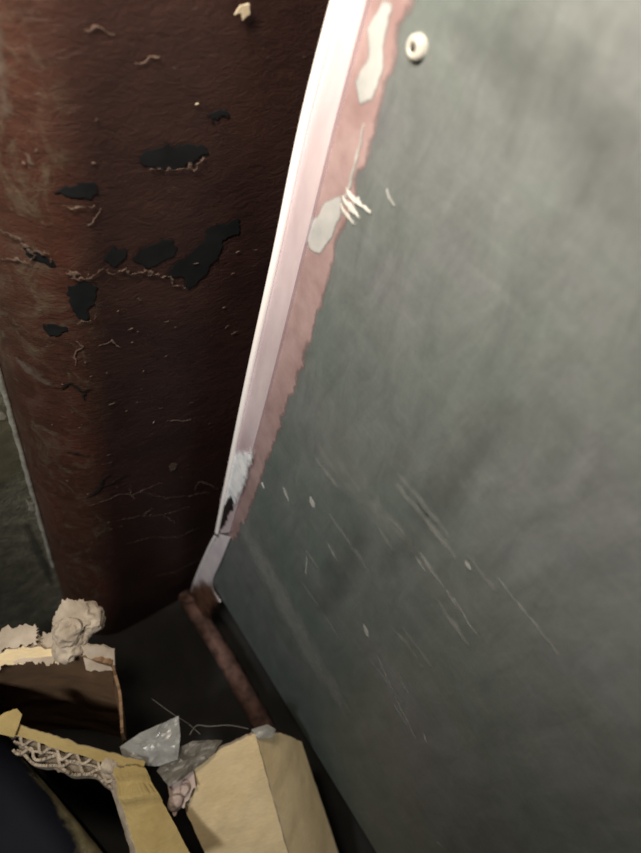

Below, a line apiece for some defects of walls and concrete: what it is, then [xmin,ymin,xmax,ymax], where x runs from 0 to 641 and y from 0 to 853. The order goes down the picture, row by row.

peeling [356,1,391,104]
peeling [54,182,98,210]
peeling [138,143,209,172]
peeling [308,128,370,253]
peeling [66,218,240,324]
peeling [42,324,67,336]